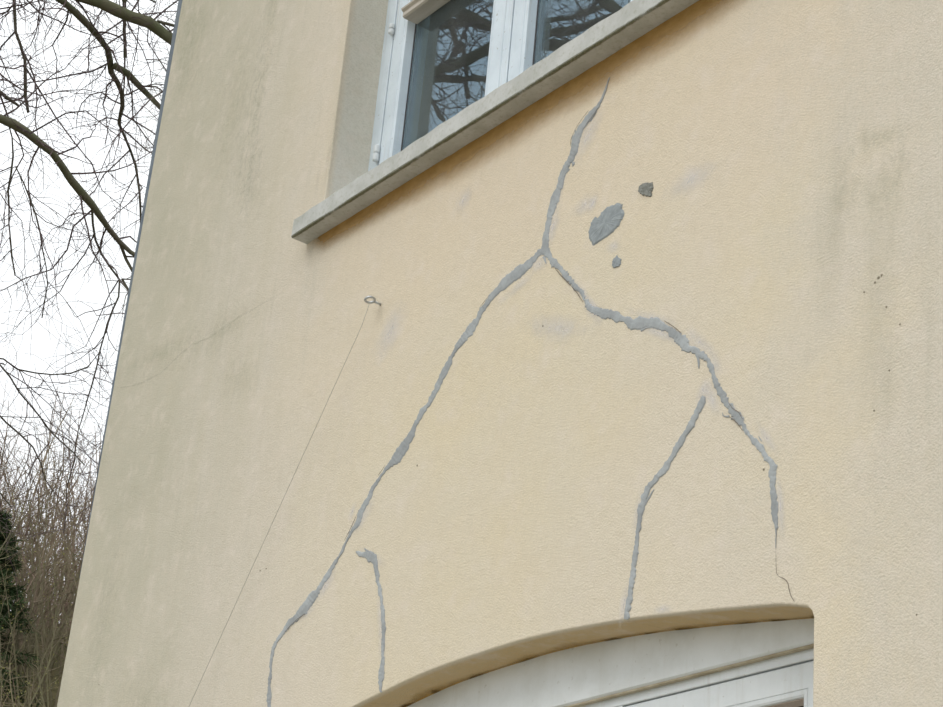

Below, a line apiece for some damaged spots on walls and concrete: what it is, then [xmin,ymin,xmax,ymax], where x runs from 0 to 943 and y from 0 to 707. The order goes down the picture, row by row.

spalling [638,182,653,197]
spalling [588,203,624,246]
crack [266,77,793,707]